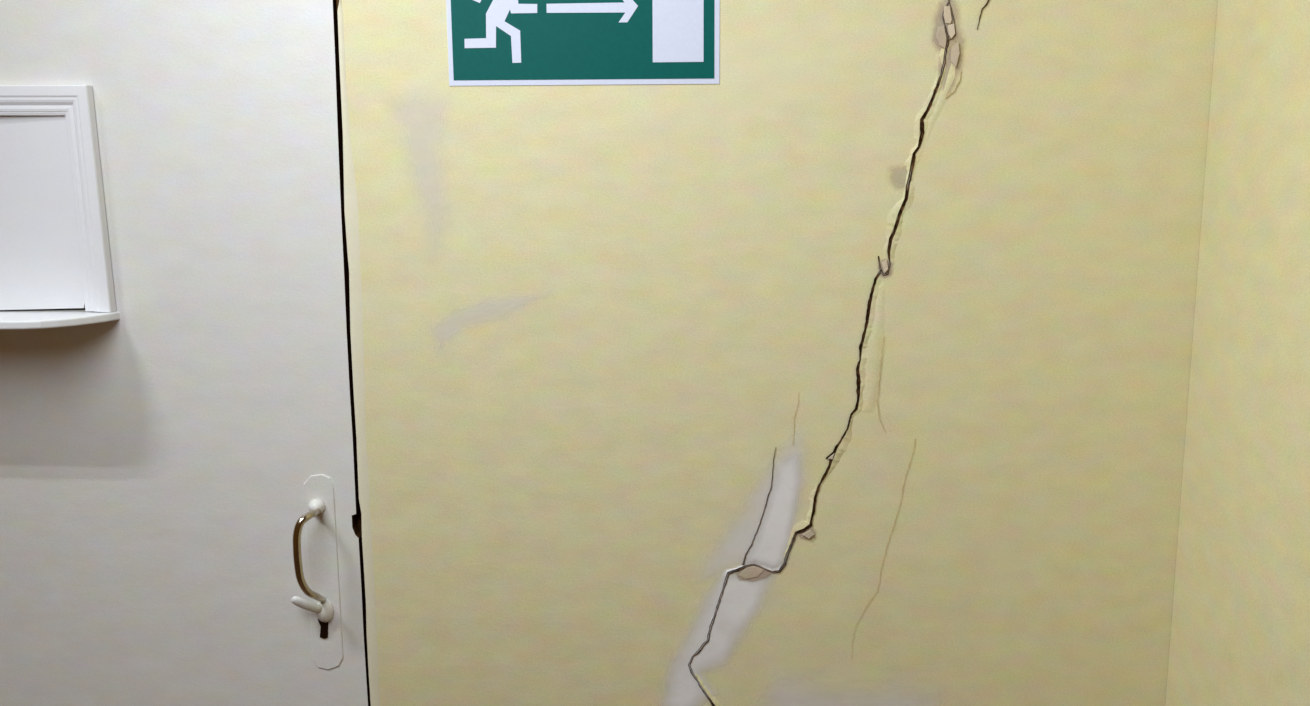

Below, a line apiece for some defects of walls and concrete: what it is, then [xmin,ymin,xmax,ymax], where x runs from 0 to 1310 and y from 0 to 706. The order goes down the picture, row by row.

spalling [935,0,963,87]
crack [688,0,989,706]
spalling [737,564,772,581]